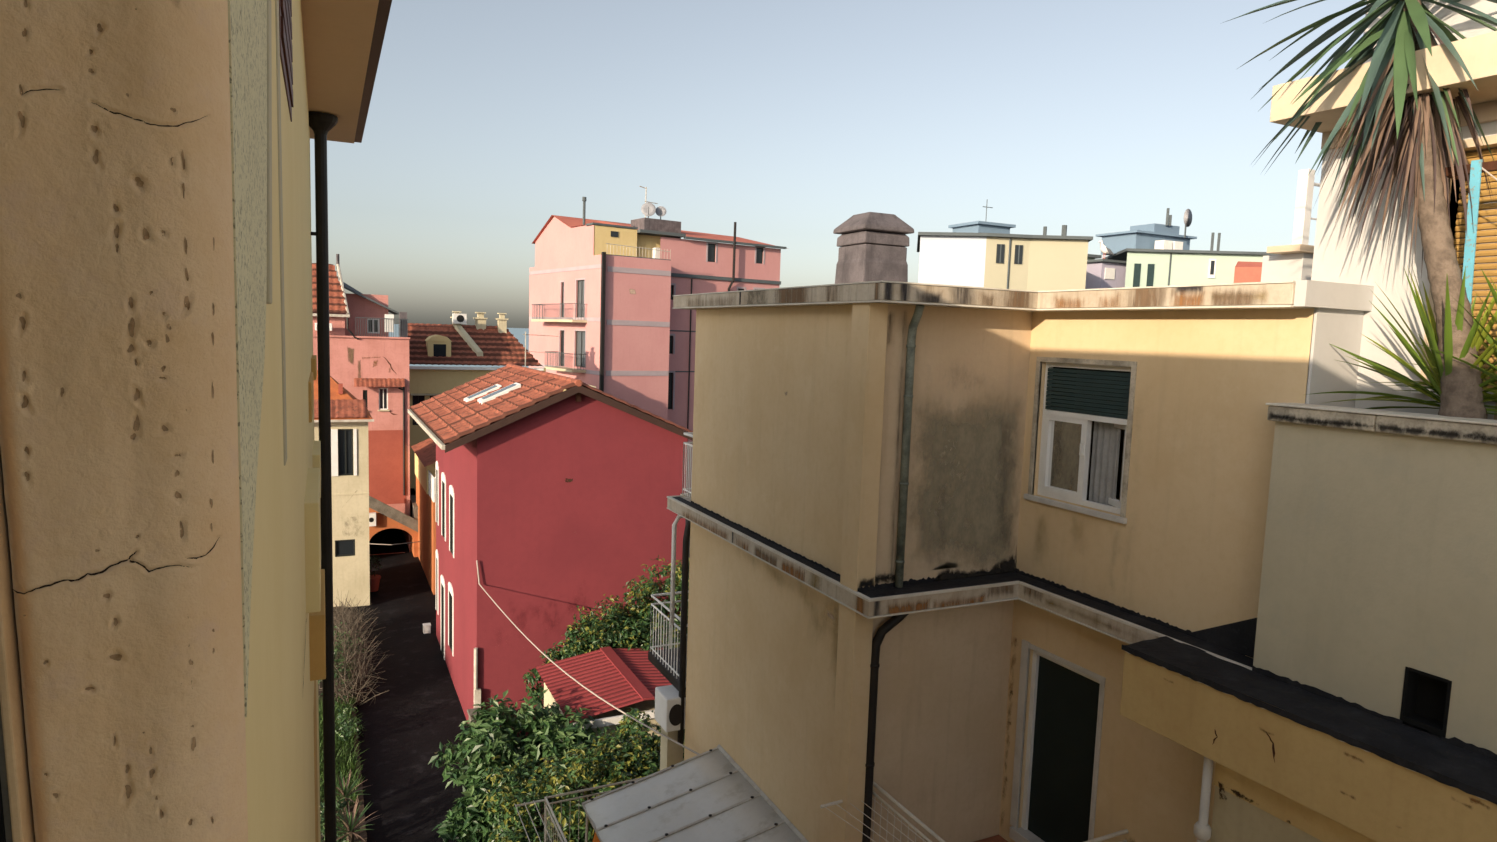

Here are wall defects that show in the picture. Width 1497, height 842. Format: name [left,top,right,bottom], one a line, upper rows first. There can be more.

crack [91,102,206,127]
leakage [920,410,1017,581]
crack [12,538,219,594]